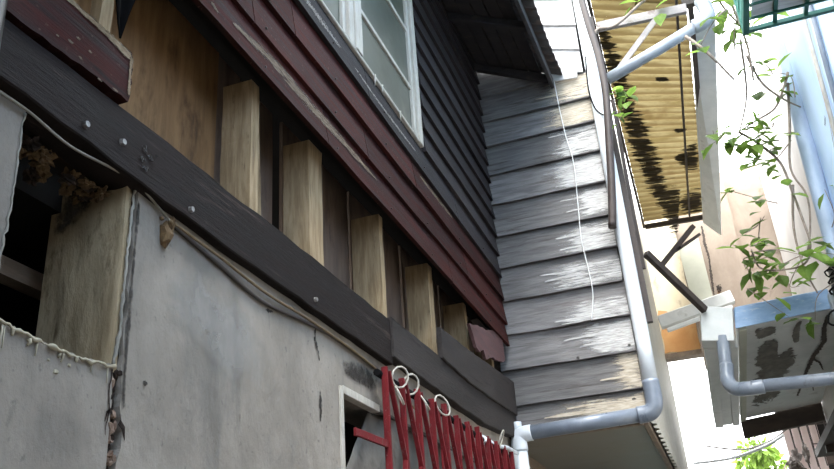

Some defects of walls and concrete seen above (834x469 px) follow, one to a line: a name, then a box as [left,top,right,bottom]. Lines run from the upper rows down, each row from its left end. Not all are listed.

spalling [0,113,27,269]
crack [105,200,140,469]
spalling [111,190,137,364]
peeling [535,73,617,252]
peeling [540,258,623,291]
peeling [545,296,645,419]